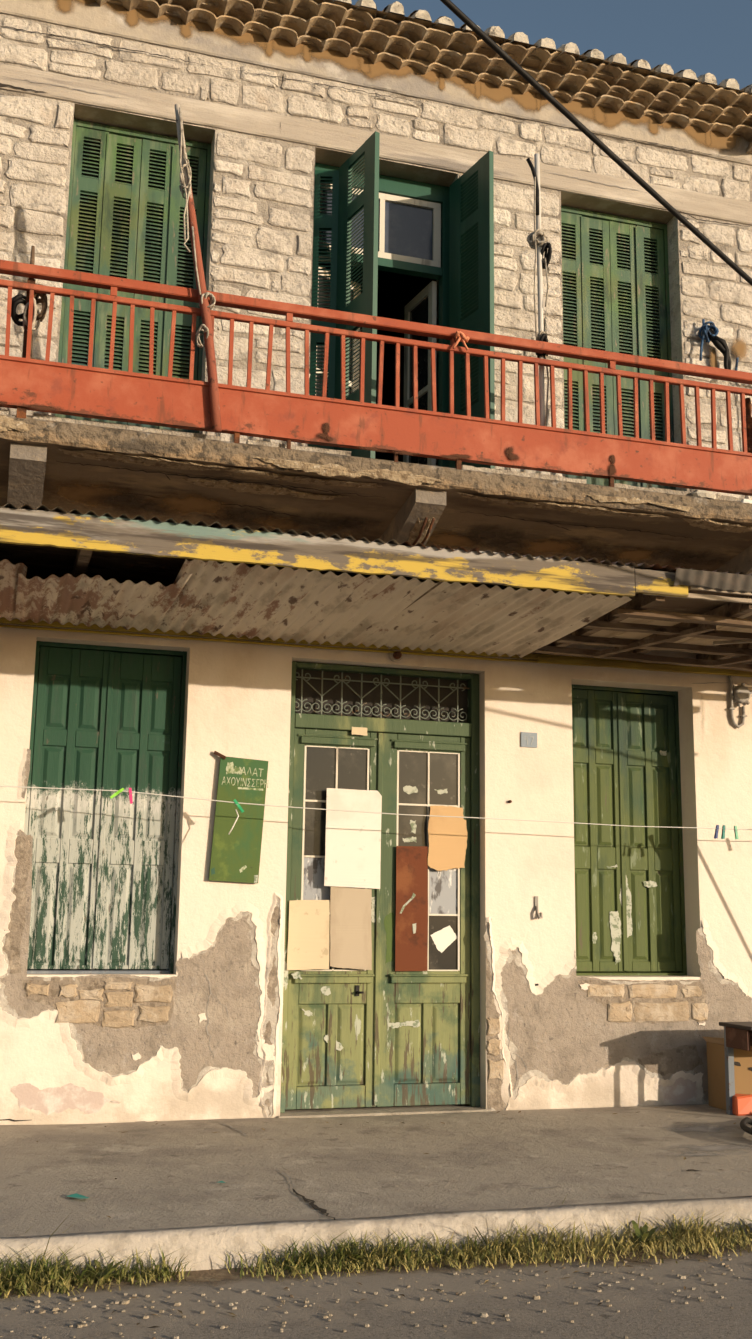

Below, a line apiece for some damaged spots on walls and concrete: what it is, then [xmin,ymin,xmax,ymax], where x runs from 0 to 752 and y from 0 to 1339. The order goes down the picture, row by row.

flaking render [17,748,31,800]
flaking render [0,821,284,1121]
flaking render [484,916,752,1111]
peeling [592,864,657,964]